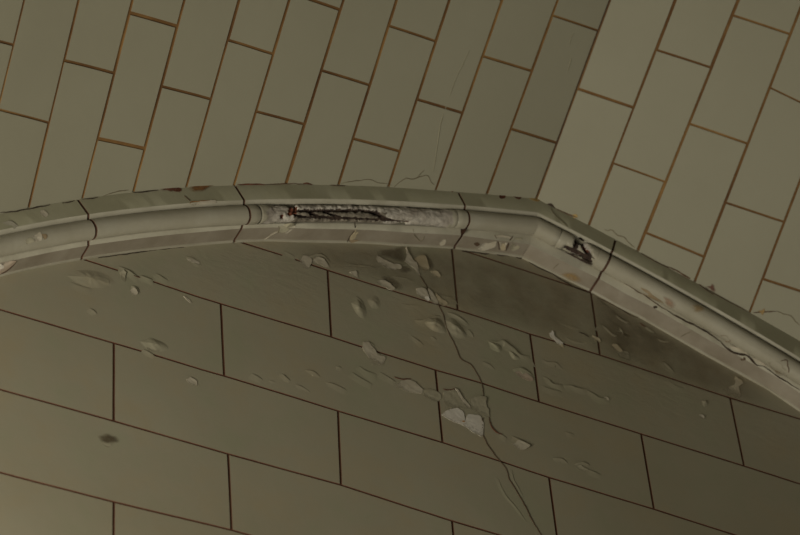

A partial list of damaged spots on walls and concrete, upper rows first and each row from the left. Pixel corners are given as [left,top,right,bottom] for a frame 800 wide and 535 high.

spalling [257,204,458,240]
peeling [345,247,458,306]
spalling [462,235,522,259]
spalling [554,230,600,265]
crack [420,276,484,396]
crack [529,262,800,390]
spalling [441,388,530,450]
crack [482,417,541,535]